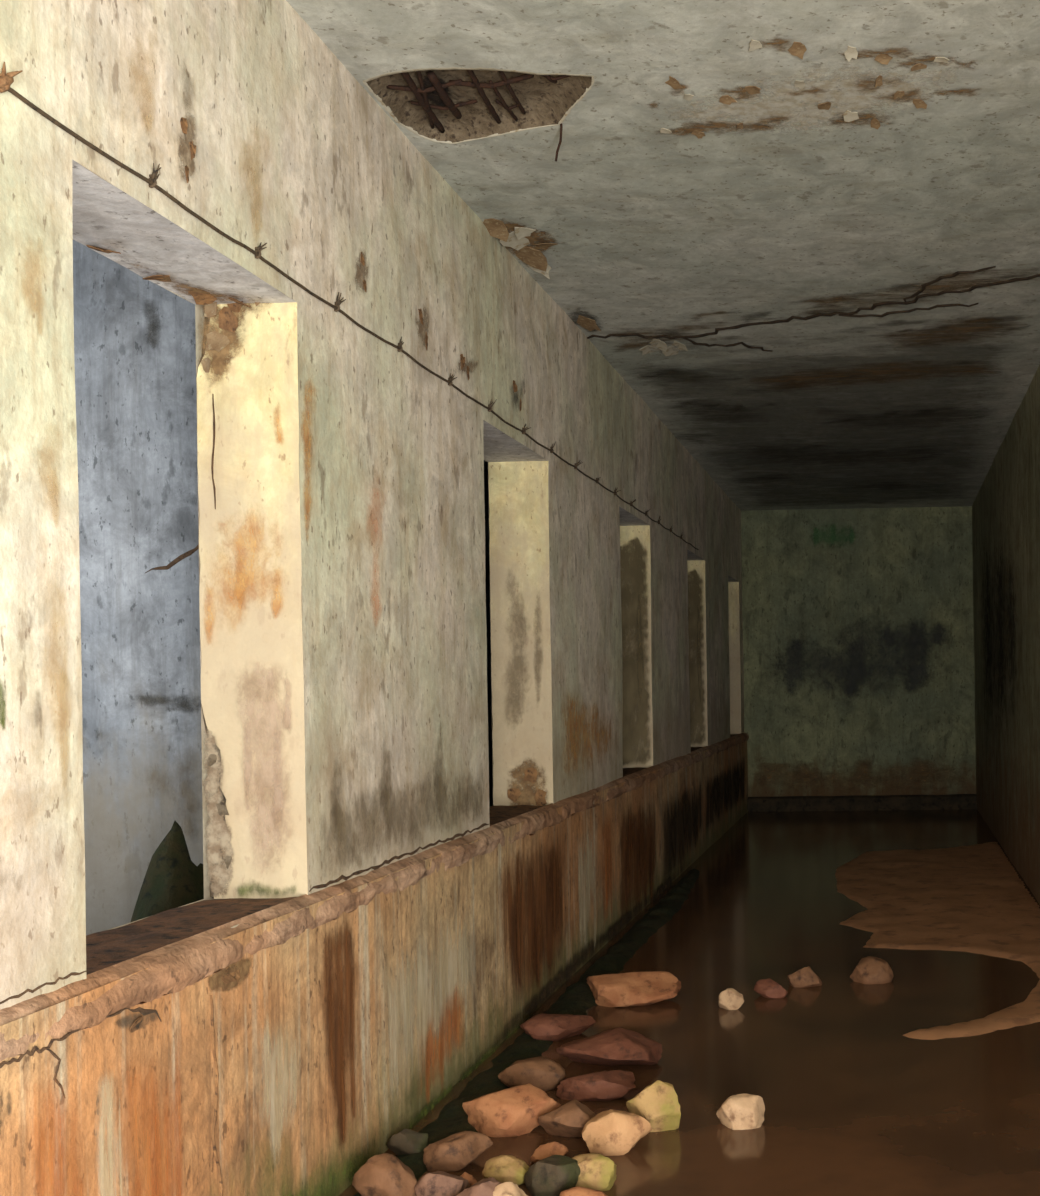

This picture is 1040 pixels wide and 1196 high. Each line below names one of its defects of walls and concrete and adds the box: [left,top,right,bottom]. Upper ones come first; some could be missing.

spalling [363,67,595,162]
flaking render [660,45,979,139]
flaking render [135,265,260,380]
crack [587,266,1040,352]
water stain [665,318,1014,503]
crack [146,544,199,573]
rust [224,521,281,616]
flaking render [204,731,233,897]
flaking render [507,760,547,806]
crack [0,970,88,1004]
crack [106,1007,162,1022]
crack [0,1029,80,1098]